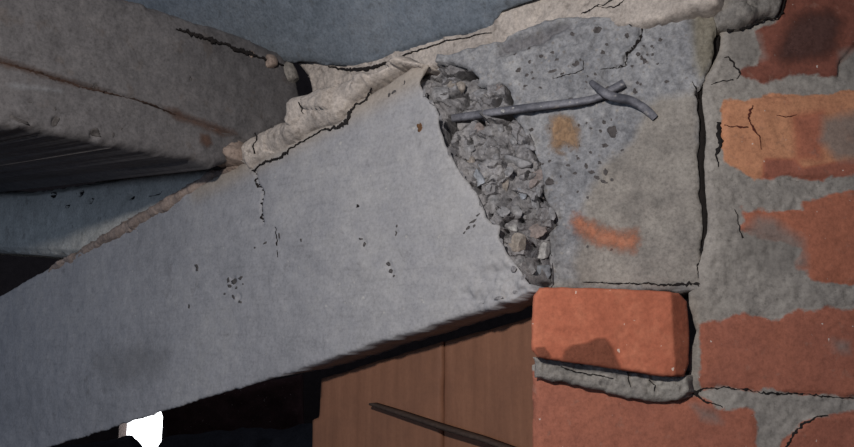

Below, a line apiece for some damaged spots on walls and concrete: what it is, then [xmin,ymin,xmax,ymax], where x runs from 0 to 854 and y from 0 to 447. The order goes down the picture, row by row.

crack [176,28,284,66]
spalling [515,47,564,89]
crack [251,32,491,257]
corrosion [551,116,578,153]
crack [586,0,785,287]
spalling [420,64,617,288]
crack [692,386,854,447]